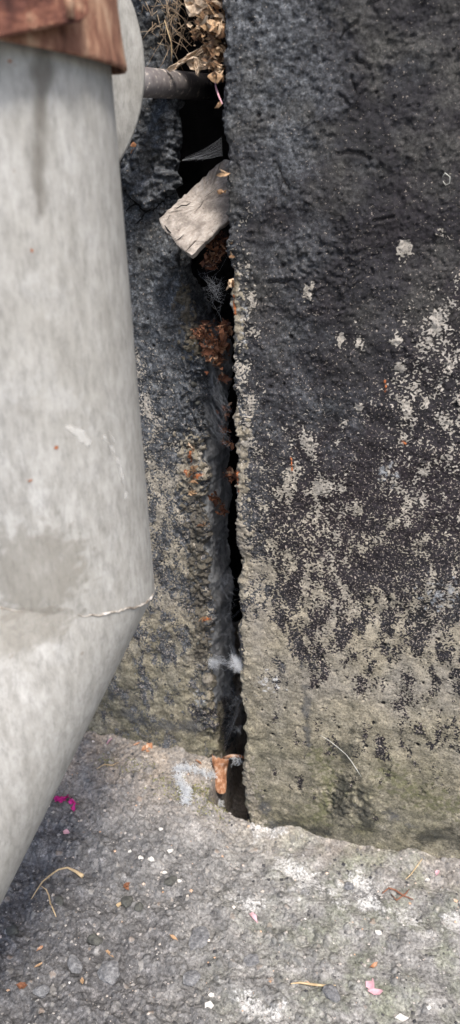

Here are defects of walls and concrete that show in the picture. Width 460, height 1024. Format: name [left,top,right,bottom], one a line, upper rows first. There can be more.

crack [121,0,230,224]
crack [191,223,243,622]
leakage [251,795,333,839]
leakage [330,729,375,828]
leakage [416,828,460,847]